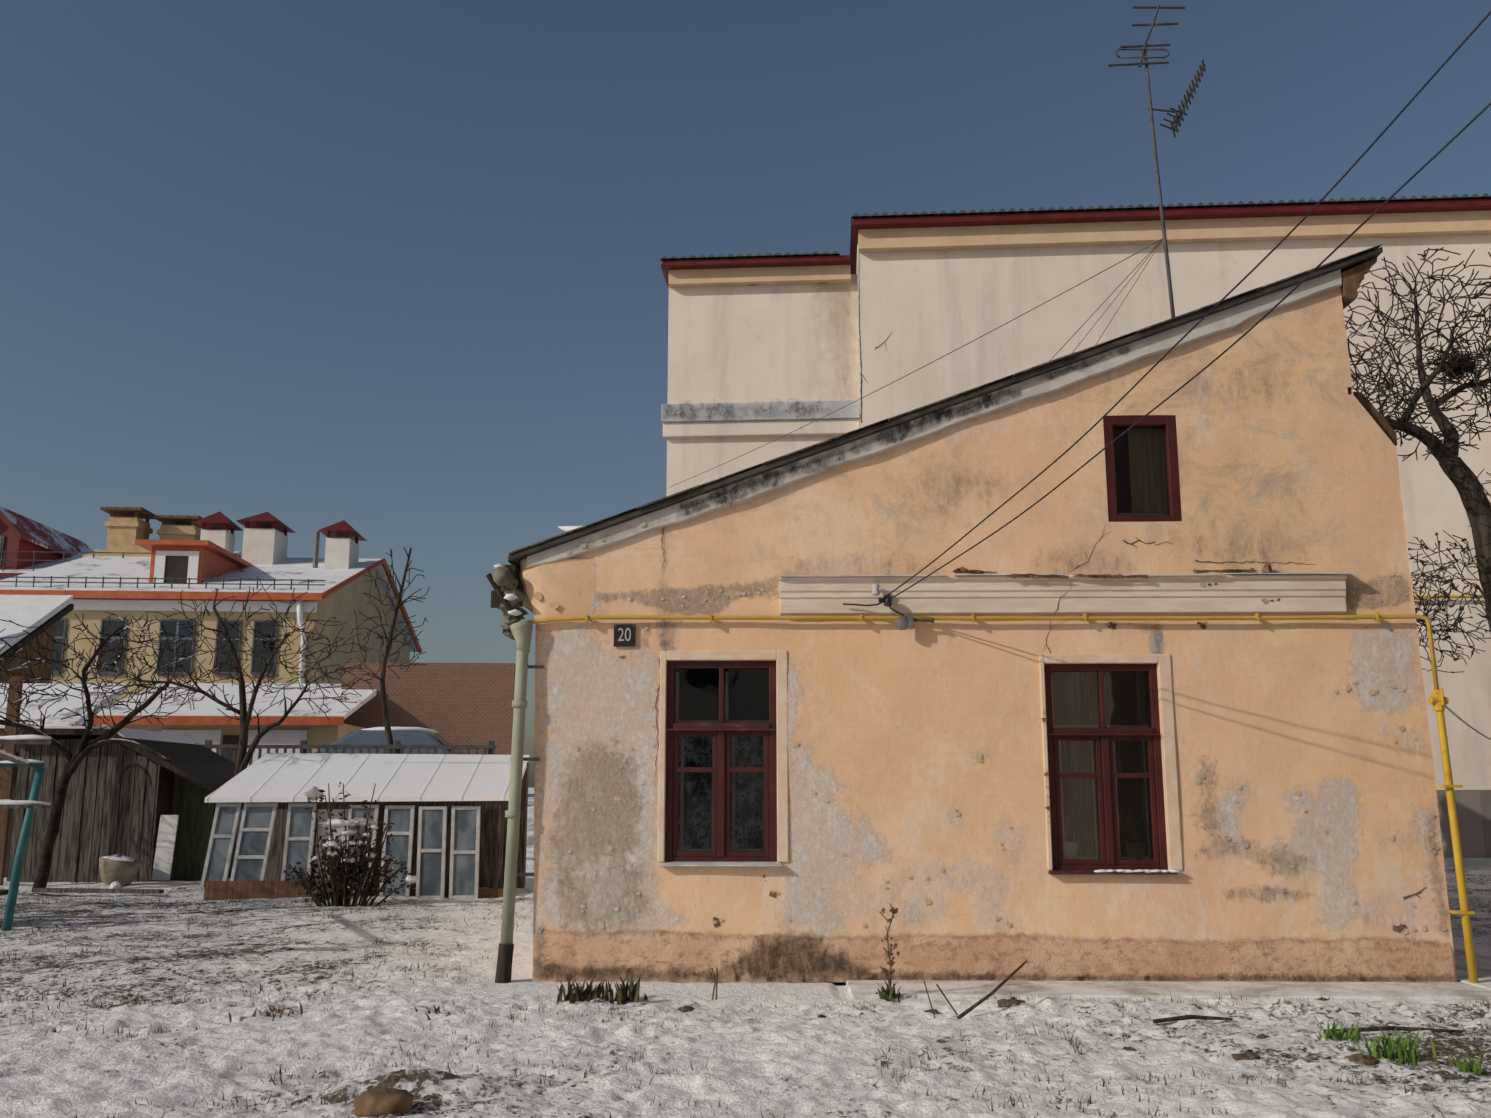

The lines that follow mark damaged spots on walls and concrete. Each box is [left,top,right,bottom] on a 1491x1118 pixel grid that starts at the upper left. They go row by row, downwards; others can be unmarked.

crack [1042,531,1309,653]
spalling [1346,573,1408,609]
peeling [1332,625,1423,751]
water stain [538,964,644,980]
water stain [732,936,920,983]